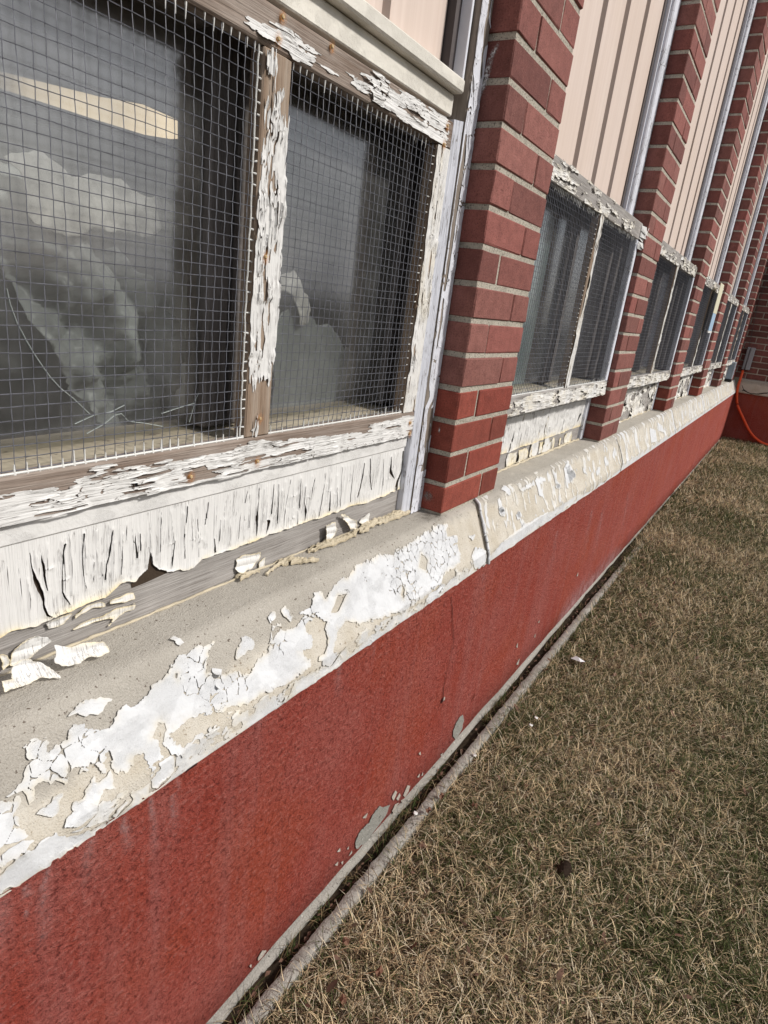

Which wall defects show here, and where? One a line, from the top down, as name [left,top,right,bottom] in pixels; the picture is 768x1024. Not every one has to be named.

crack [0,0,492,638]
peeling [244,16,450,391]
peeling [0,246,749,898]
peeling [506,155,649,467]